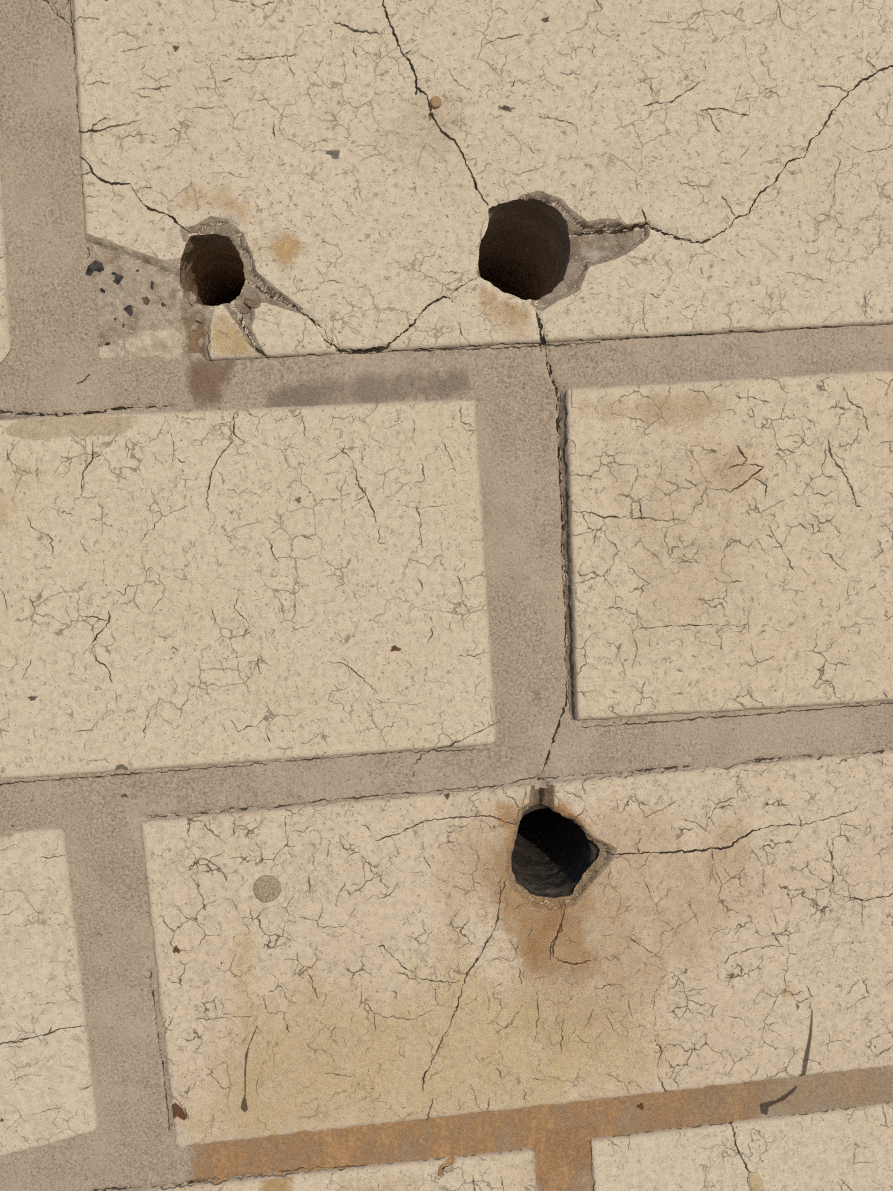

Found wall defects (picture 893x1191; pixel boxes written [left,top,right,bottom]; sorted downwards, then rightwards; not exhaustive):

crack [79,0,548,232]
crack [444,1,893,317]
spalling [85,216,304,361]
crack [248,245,482,354]
spalling [519,191,650,311]
crack [0,405,501,777]
crack [535,309,893,804]
rust [497,808,588,973]
spalling [506,783,617,910]
crack [0,1002,81,1087]
rust [194,1080,767,1191]
crack [730,1120,750,1172]